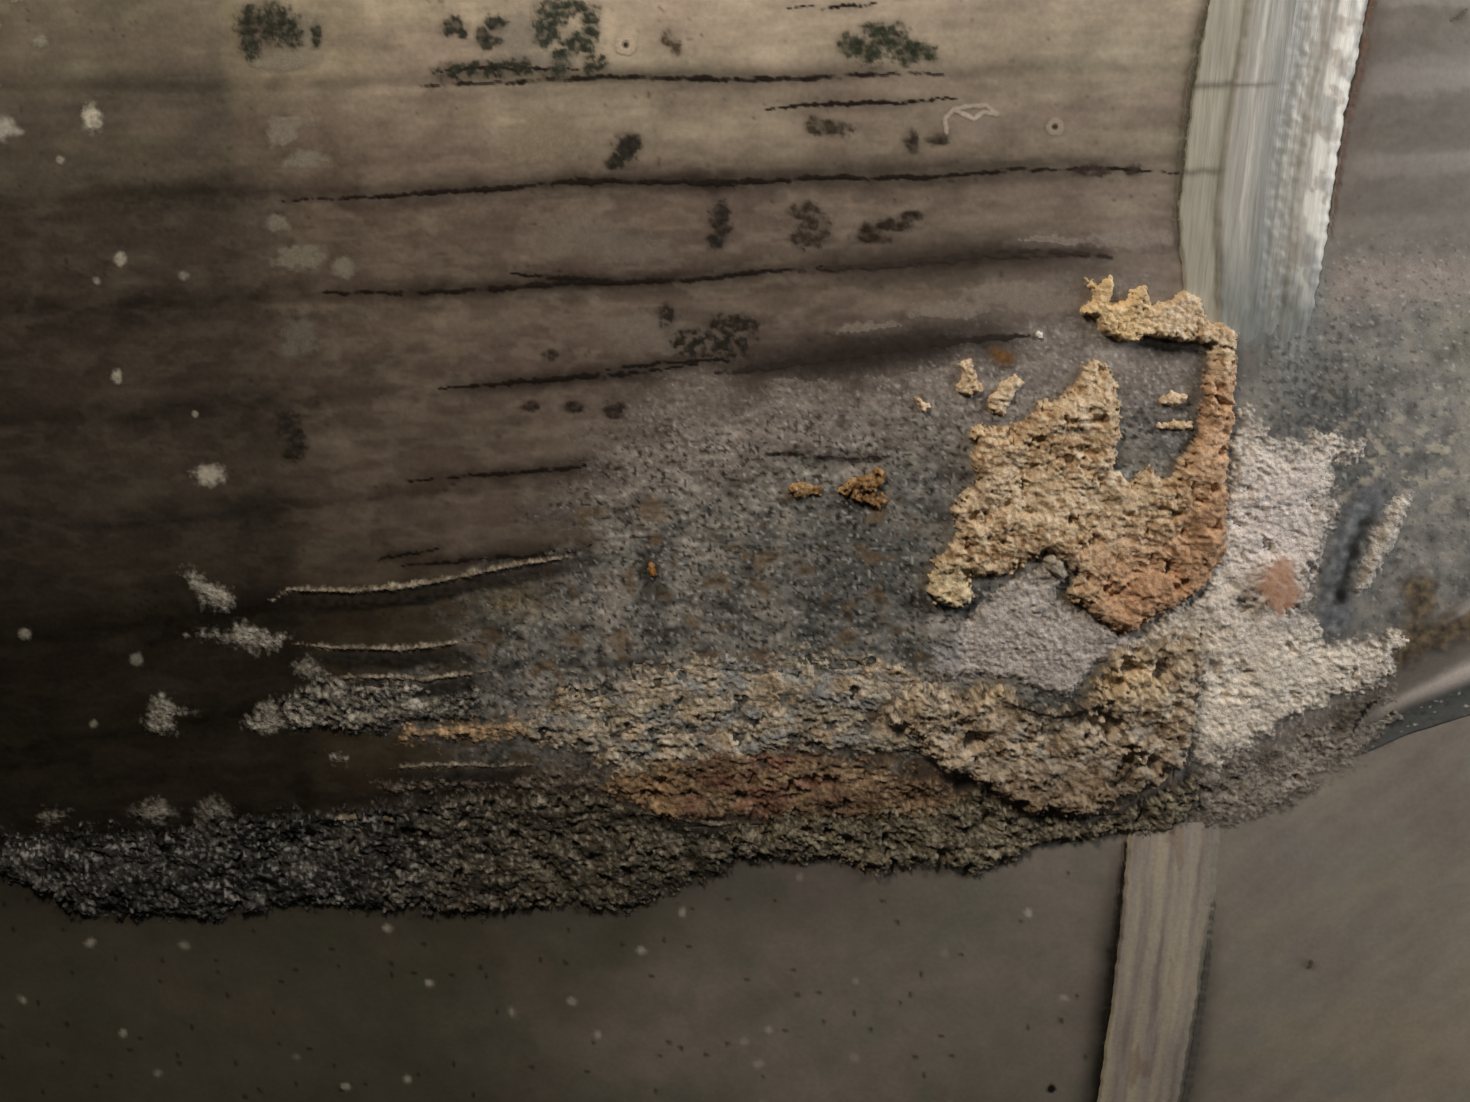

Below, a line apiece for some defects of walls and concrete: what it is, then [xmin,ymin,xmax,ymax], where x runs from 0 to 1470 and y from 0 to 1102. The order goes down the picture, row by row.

water stain [432,15,532,79]
water stain [532,0,606,74]
crack [281,0,1209,245]
crack [323,265,823,295]
crack [438,357,730,389]
peeling [269,555,568,607]
crack [378,543,603,566]
corrosion [0,242,1470,923]
water stain [184,572,286,657]
peeling [296,640,493,696]
water stain [146,693,187,735]
peeling [398,761,536,783]